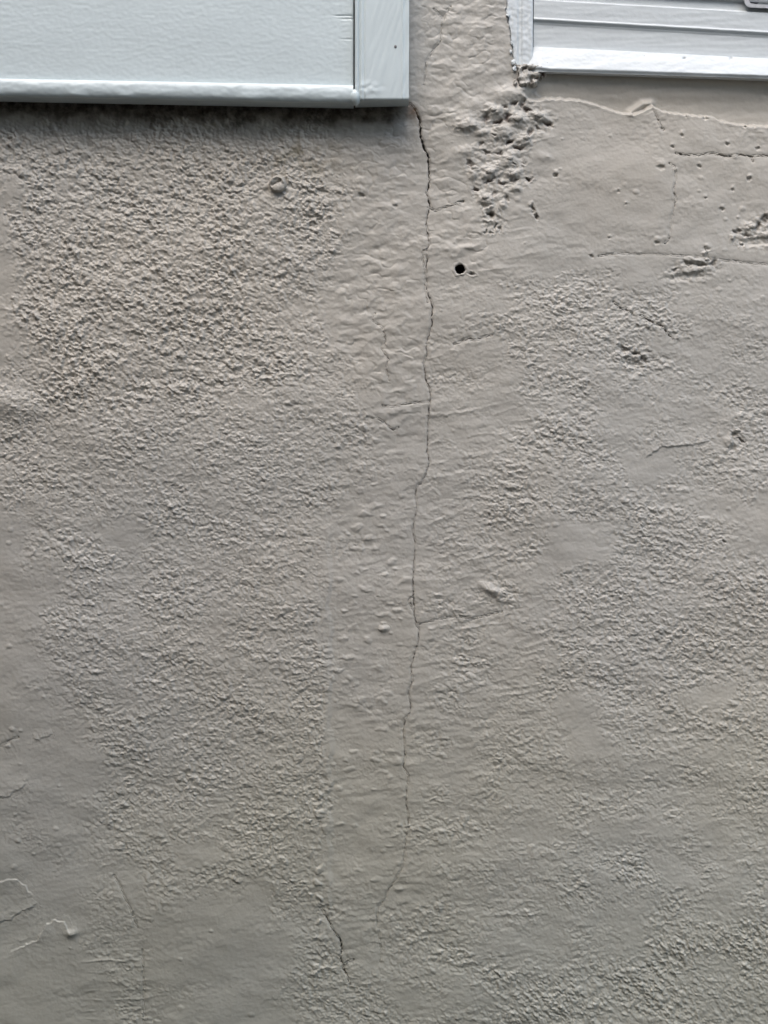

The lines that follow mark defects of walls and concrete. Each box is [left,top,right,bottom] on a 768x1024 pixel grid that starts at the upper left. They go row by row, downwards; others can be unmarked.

flaking render [446,41,768,236]
crack [652,108,664,131]
crack [599,152,768,266]
crack [370,6,502,962]
crack [320,907,354,984]